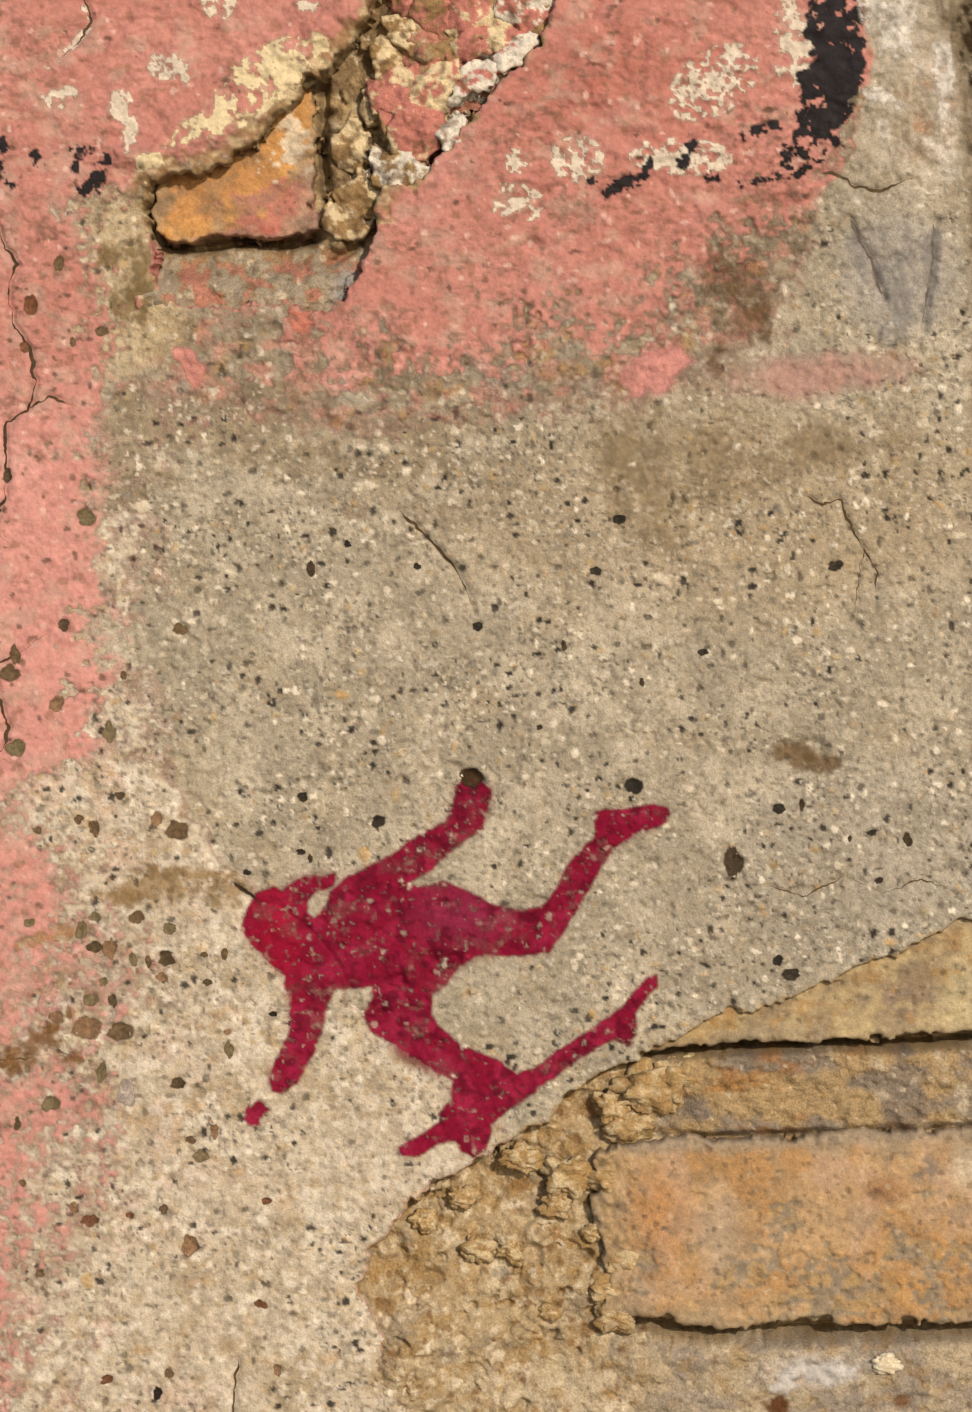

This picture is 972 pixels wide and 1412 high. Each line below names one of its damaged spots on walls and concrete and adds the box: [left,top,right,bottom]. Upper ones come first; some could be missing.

peeling [817,86,866,183]
spalling [24,294,38,314]
spalling [40,0,816,648]
crack [0,234,67,512]
spalling [828,560,844,571]
spalling [0,644,21,682]
crack [0,699,11,752]
peeling [0,660,972,1412]
crack [232,1360,240,1412]